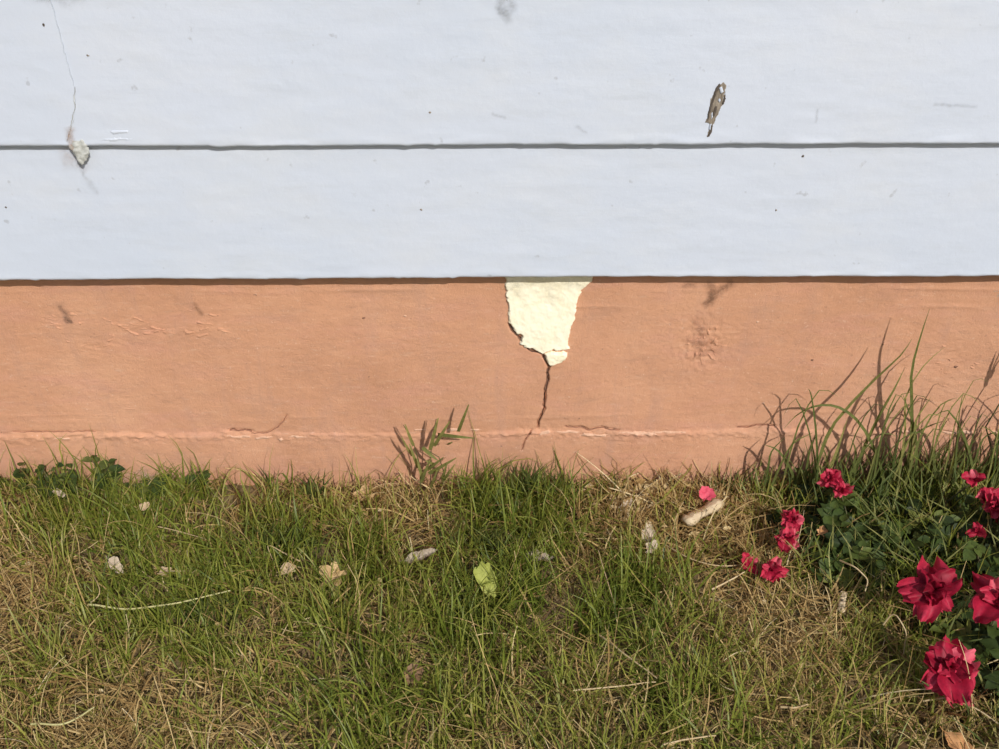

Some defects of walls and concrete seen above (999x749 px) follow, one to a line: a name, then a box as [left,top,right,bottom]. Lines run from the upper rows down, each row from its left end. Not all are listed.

crack [50,0,76,140]
peeling [705,82,726,137]
spalling [505,276,593,366]
crack [509,324,549,449]
crack [566,424,619,432]